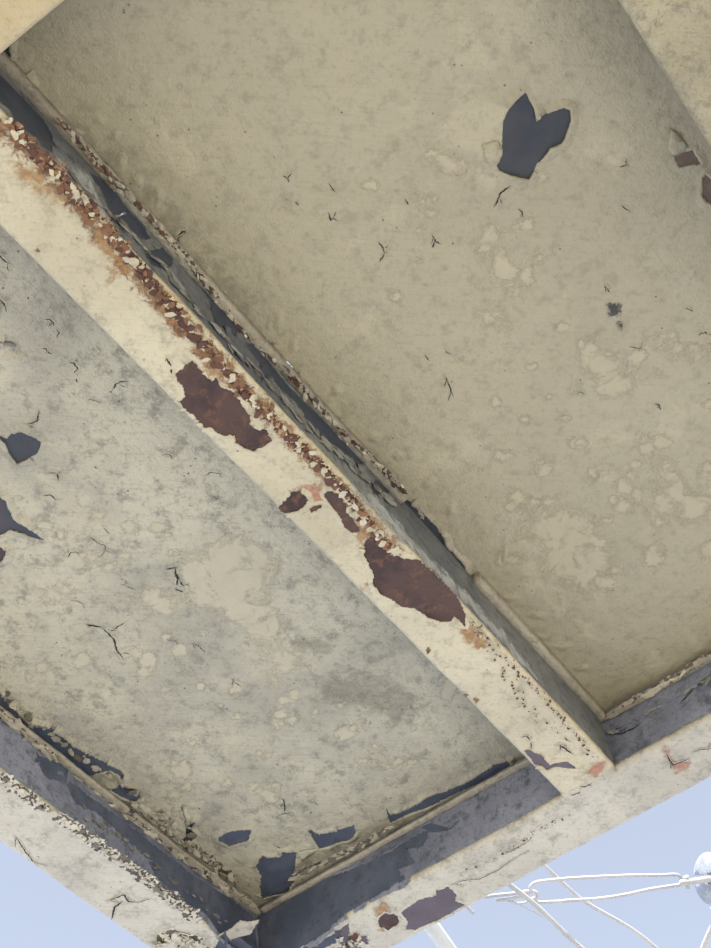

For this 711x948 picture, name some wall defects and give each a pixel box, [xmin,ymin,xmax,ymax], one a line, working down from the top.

peeling [482,85,580,188]
rust [0,119,404,551]
peeling [0,75,474,630]
leakage [475,218,544,298]
leakage [577,331,711,397]
leakage [504,434,711,600]
peeling [604,654,711,734]
peeling [0,677,584,948]